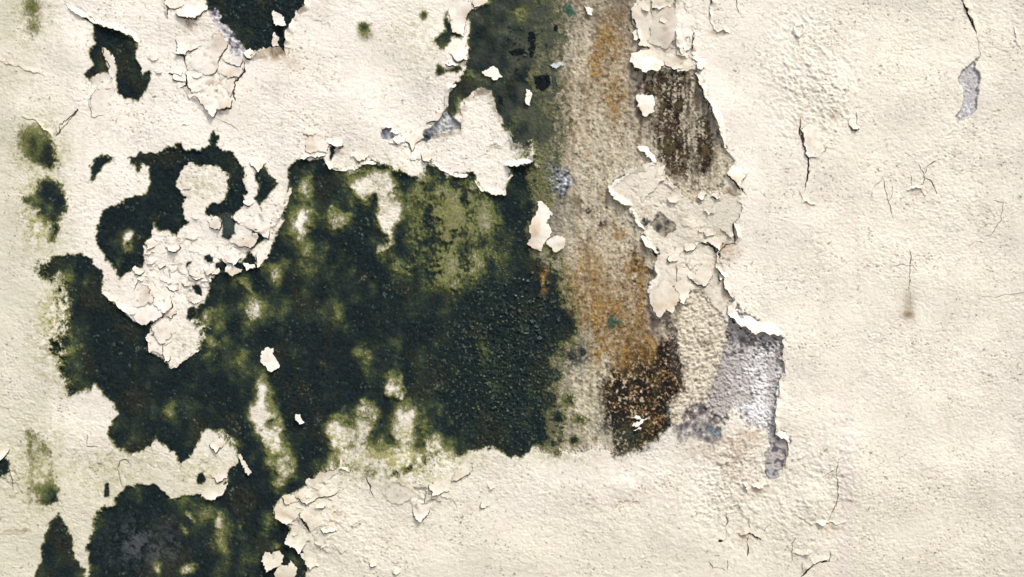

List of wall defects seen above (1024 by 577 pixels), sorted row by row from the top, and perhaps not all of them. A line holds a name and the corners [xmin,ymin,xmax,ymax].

water stain [17,122,69,243]
peeling [55,48,117,136]
peeling [65,0,311,130]
peeling [102,188,292,372]
water stain [25,0,589,577]
peeling [297,128,376,171]
flaking render [381,0,791,479]
corrosion [589,23,625,118]
corrosion [570,253,657,367]
spalling [956,58,980,123]
crack [962,0,981,54]
peeling [261,455,473,577]